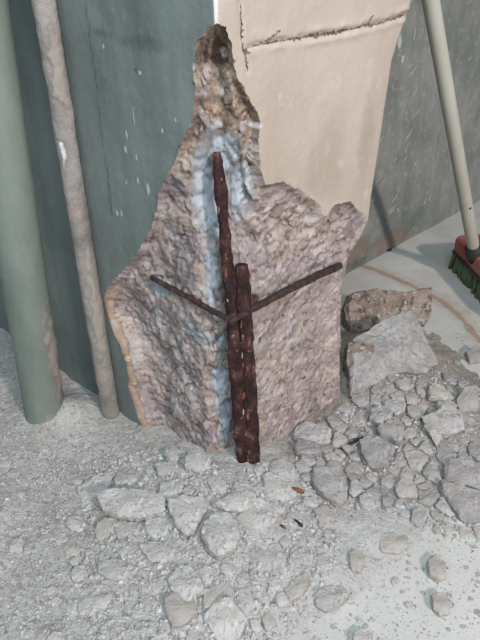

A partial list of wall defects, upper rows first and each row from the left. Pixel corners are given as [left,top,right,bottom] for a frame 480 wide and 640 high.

spalling [103,23,368,453]
crack [240,6,404,71]